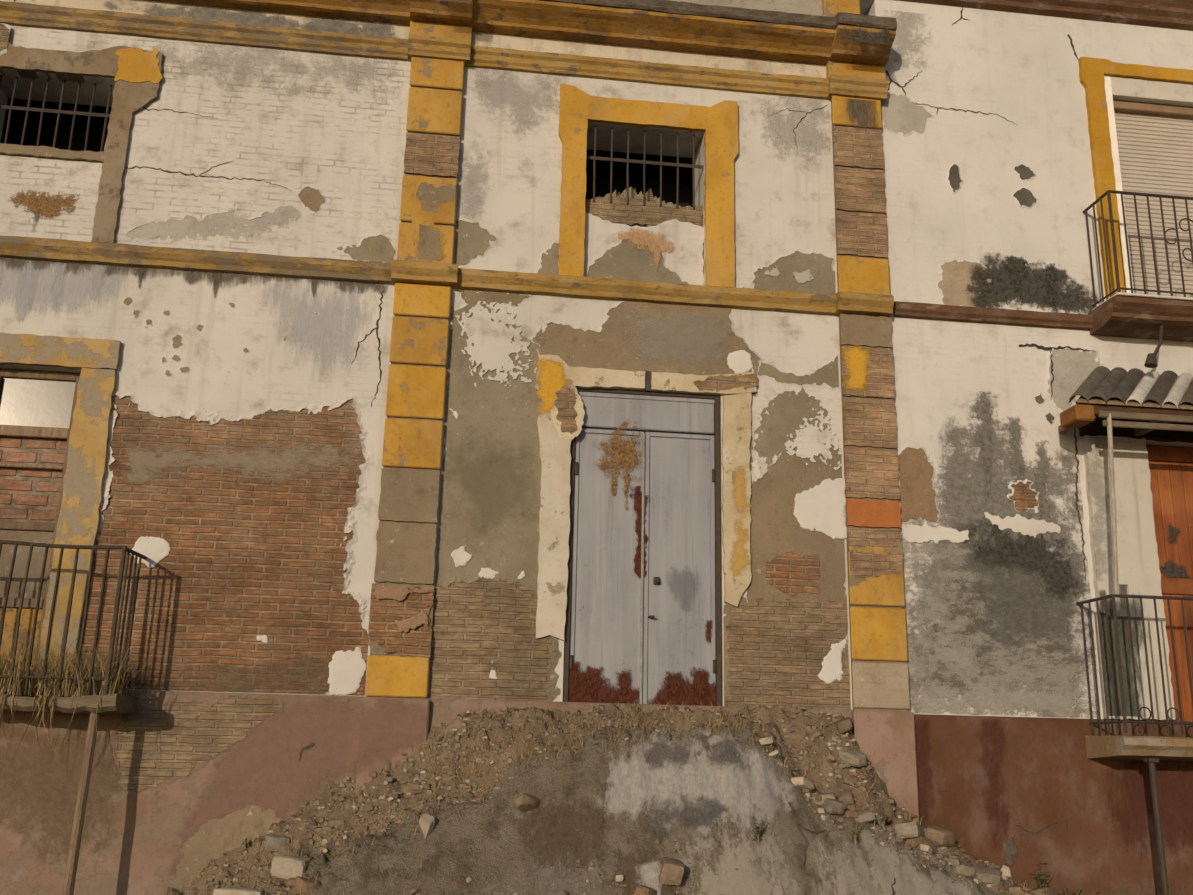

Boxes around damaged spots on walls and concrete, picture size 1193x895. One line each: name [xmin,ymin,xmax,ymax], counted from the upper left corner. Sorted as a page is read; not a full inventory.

crack [143,108,218,119]
crack [885,70,1017,125]
rust [9,190,79,221]
crack [126,161,292,191]
spalling [945,163,964,195]
spalling [1011,163,1037,210]
rust [618,227,674,268]
mould [967,253,1098,314]
rust [597,422,649,579]
flaking render [77,290,904,795]
leakage [903,392,1144,845]
rust [568,661,716,706]